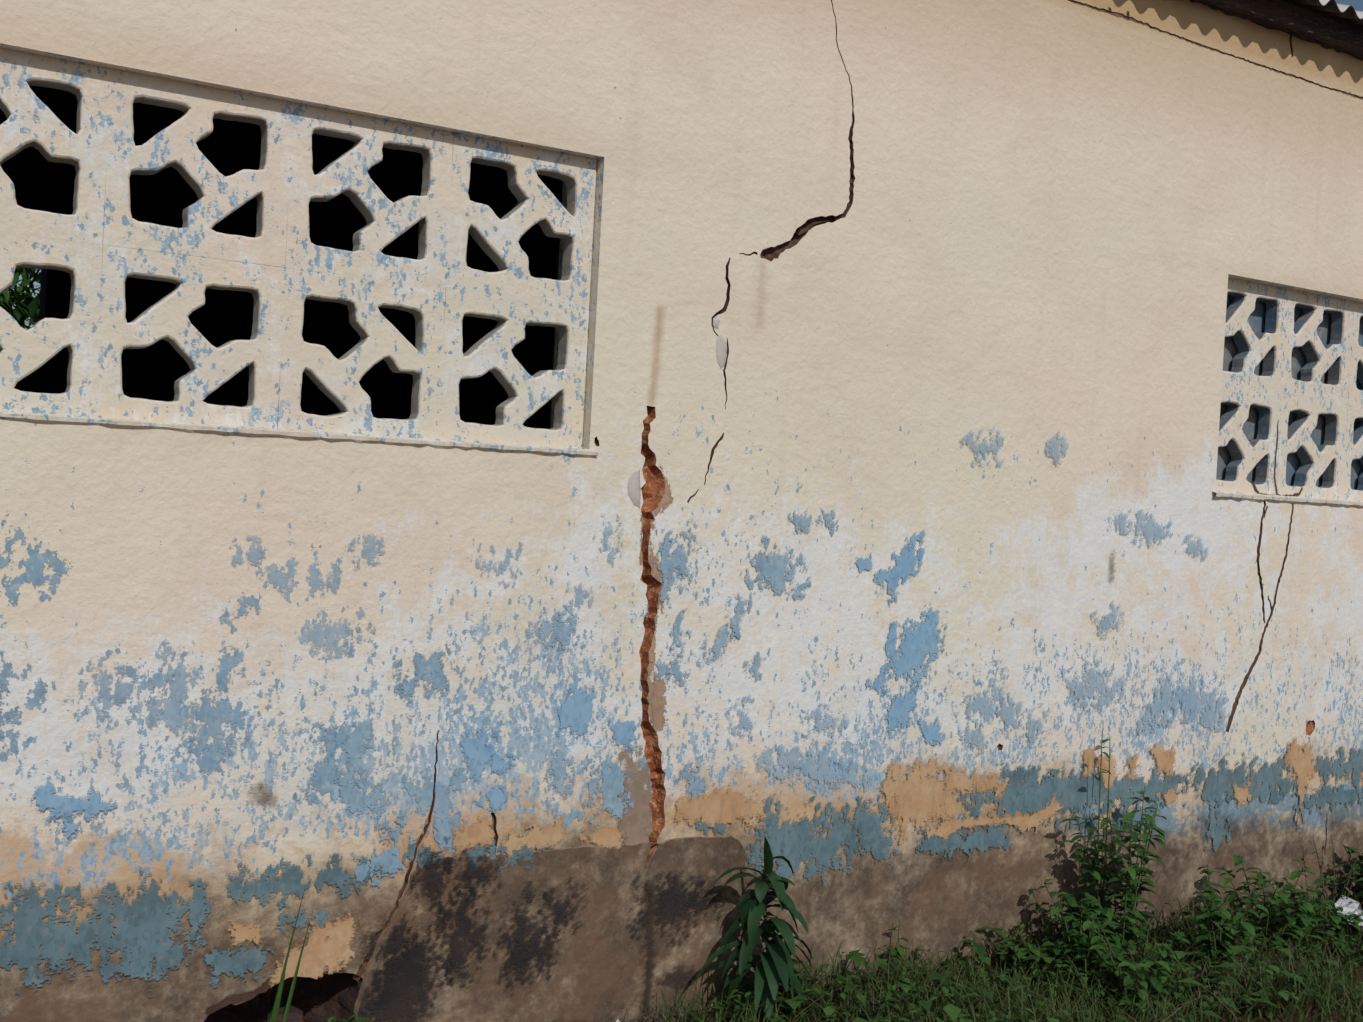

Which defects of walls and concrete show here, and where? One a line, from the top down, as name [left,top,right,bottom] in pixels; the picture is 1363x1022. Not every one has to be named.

crack [1068,0,1363,100]
crack [617,0,855,868]
peeling [0,511,73,606]
peeling [78,533,385,779]
peeling [0,676,638,1022]
crack [353,730,439,982]
leakage [358,848,589,1022]
crack [490,812,498,855]
leakage [628,871,729,1016]
peeling [651,520,812,686]
peeling [674,601,1363,885]
crack [1226,420,1303,733]